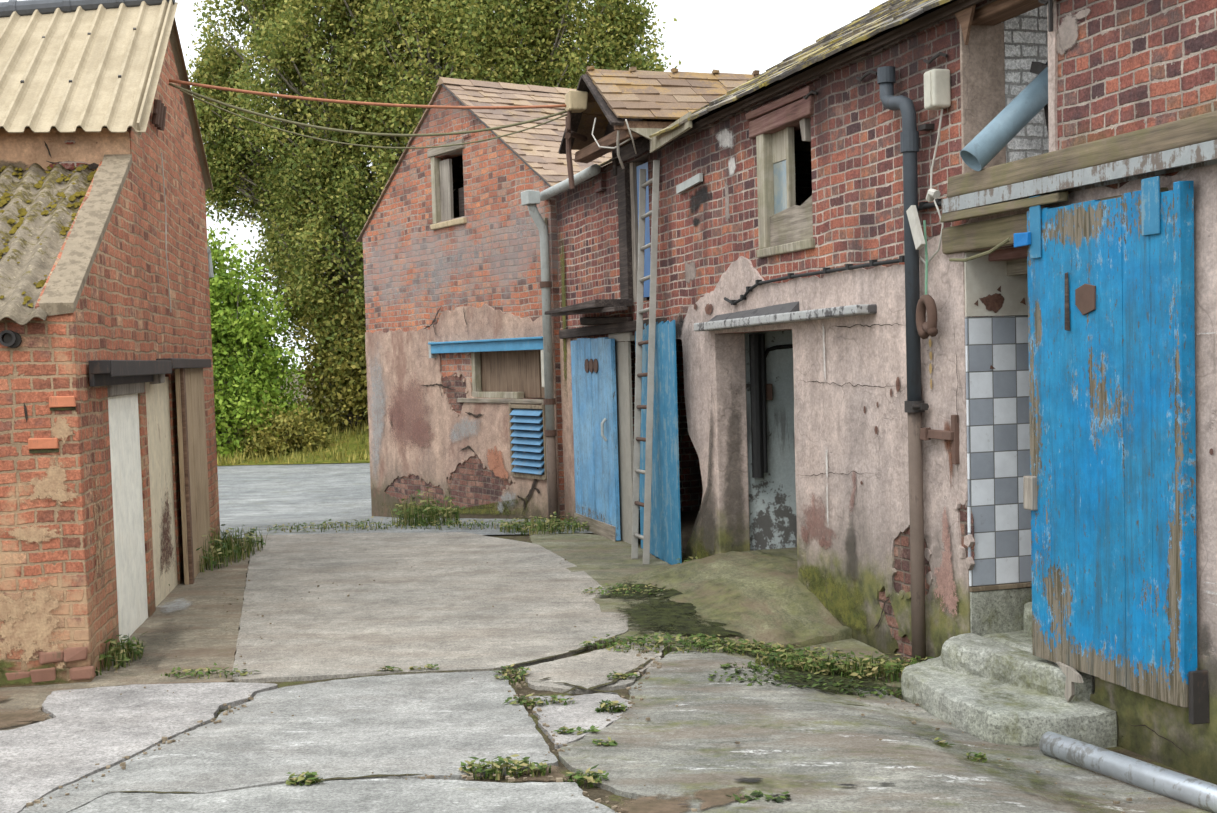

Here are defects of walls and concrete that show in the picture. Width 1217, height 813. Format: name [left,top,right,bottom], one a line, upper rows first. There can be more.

flaking render [442,370,469,416]
flaking render [385,446,513,515]
flaking render [875,492,975,662]
crack [288,619,656,695]
crack [109,788,194,796]
crack [324,773,419,781]